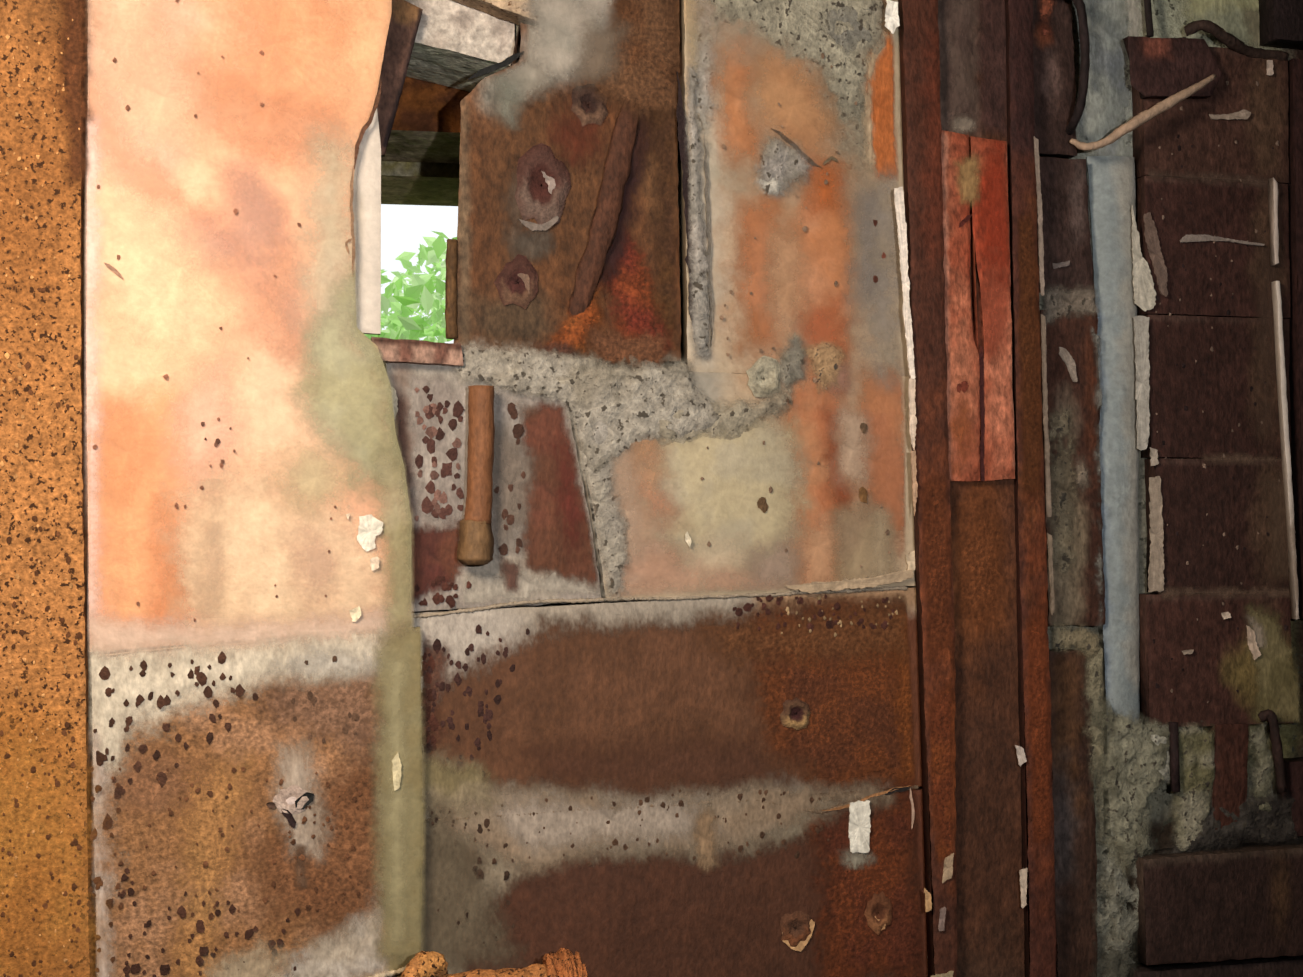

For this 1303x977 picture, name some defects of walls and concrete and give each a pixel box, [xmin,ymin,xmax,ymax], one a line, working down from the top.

corrosion [1040,0,1052,36]
corrosion [536,234,670,368]
corrosion [713,32,905,584]
corrosion [395,398,409,481]
corrosion [411,523,462,600]
water stain [86,124,894,977]
corrosion [492,402,597,591]
corrosion [623,445,682,565]
corrosion [0,746,82,977]
corrosion [101,670,386,977]
corrosion [423,598,922,977]